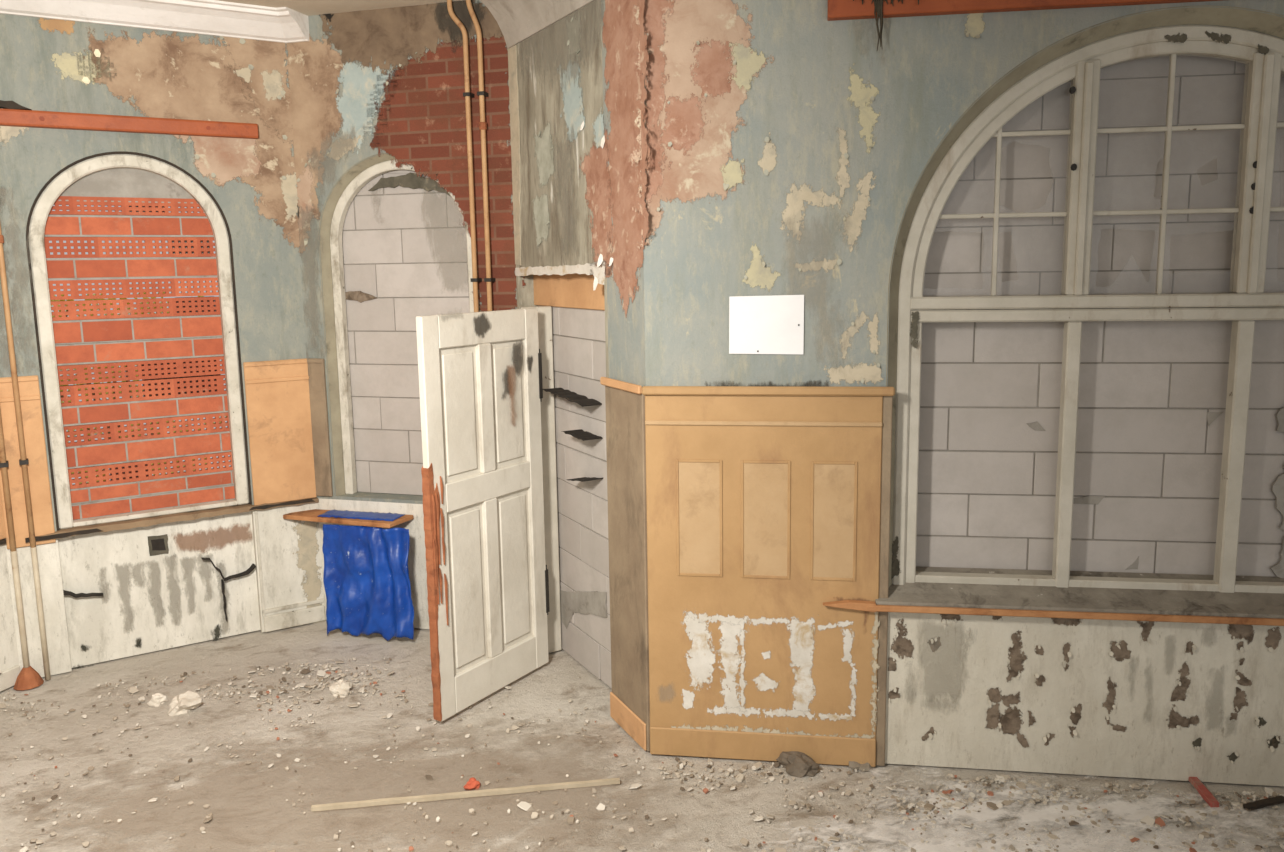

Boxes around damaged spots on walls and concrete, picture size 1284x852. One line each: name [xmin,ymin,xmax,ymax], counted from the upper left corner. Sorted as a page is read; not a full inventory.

peeling [1164,33,1187,43]
peeling [1205,31,1232,44]
flaking render [38,0,780,316]
peeling [823,311,883,385]
peeling [909,311,920,348]
flaking render [888,614,964,671]
flaking render [1051,618,1083,626]
flaking render [1109,621,1154,662]
flaking render [985,631,1082,748]
flaking render [1103,678,1127,732]
flaking render [1166,641,1202,751]
flaking render [1228,624,1283,752]